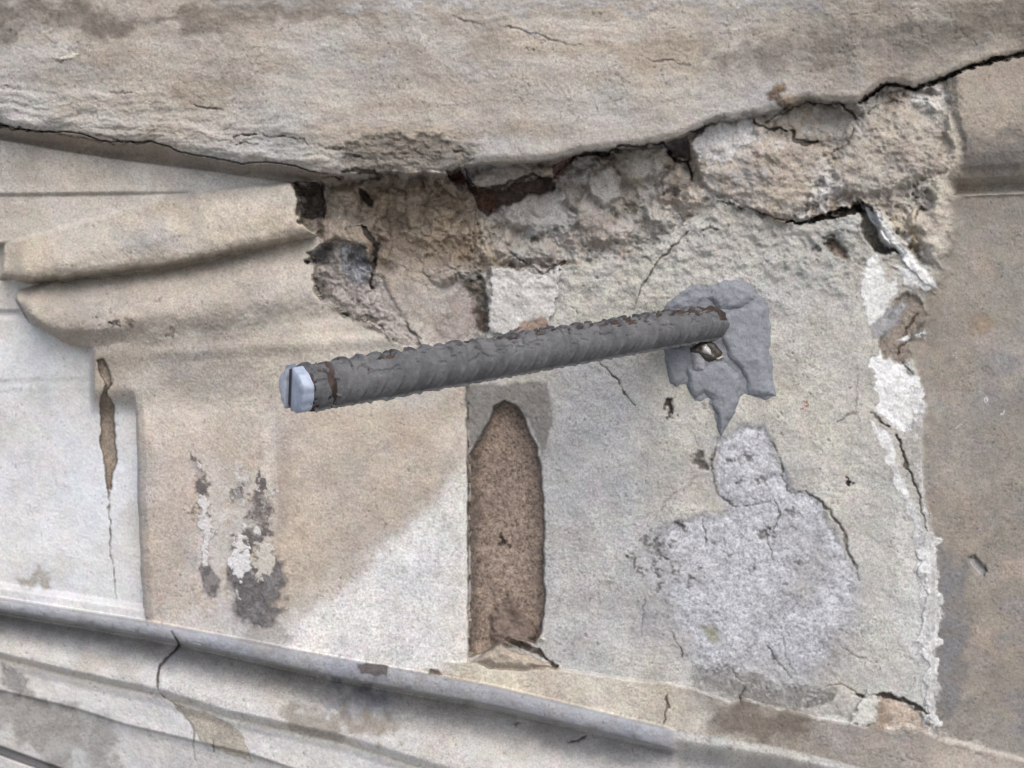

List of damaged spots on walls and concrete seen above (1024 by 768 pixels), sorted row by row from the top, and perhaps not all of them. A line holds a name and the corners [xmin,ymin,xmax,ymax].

crack [753,52,1024,153]
spalling [292,134,573,219]
crack [573,125,709,181]
spalling [689,113,767,185]
spalling [311,239,420,346]
spalling [436,252,566,339]
spalling [465,382,552,657]
crack [157,636,180,687]